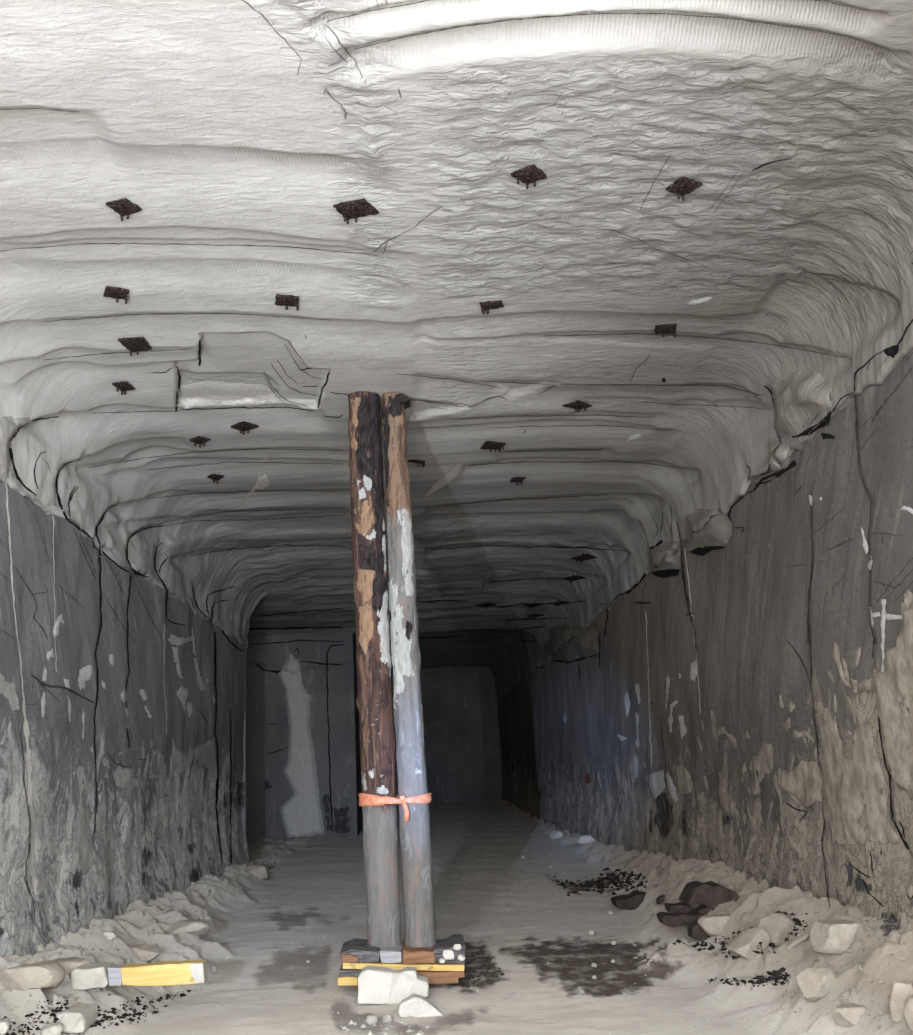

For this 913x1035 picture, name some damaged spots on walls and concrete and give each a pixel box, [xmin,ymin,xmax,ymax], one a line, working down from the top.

crack [242,0,302,75]
crack [324,88,347,119]
spalling [181,381,277,408]
crack [728,464,784,533]
crack [0,416,345,864]
crack [786,319,913,909]
crack [21,737,47,944]